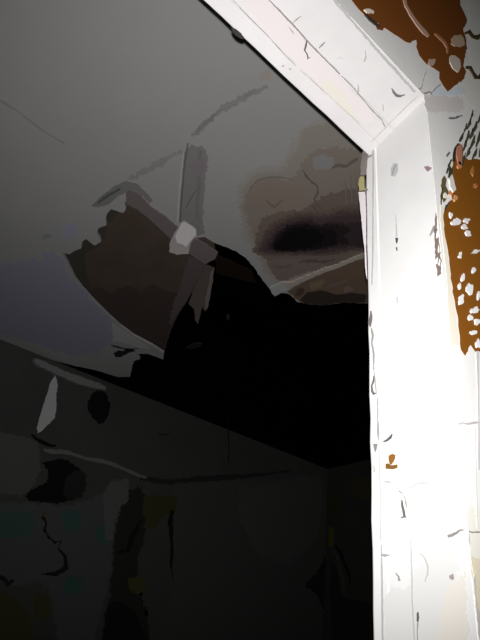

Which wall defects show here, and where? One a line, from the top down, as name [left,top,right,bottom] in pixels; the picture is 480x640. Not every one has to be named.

peeling [352,0,480,92]
damp [235,116,368,284]
damp [300,290,367,306]
corrosion [385,454,398,469]